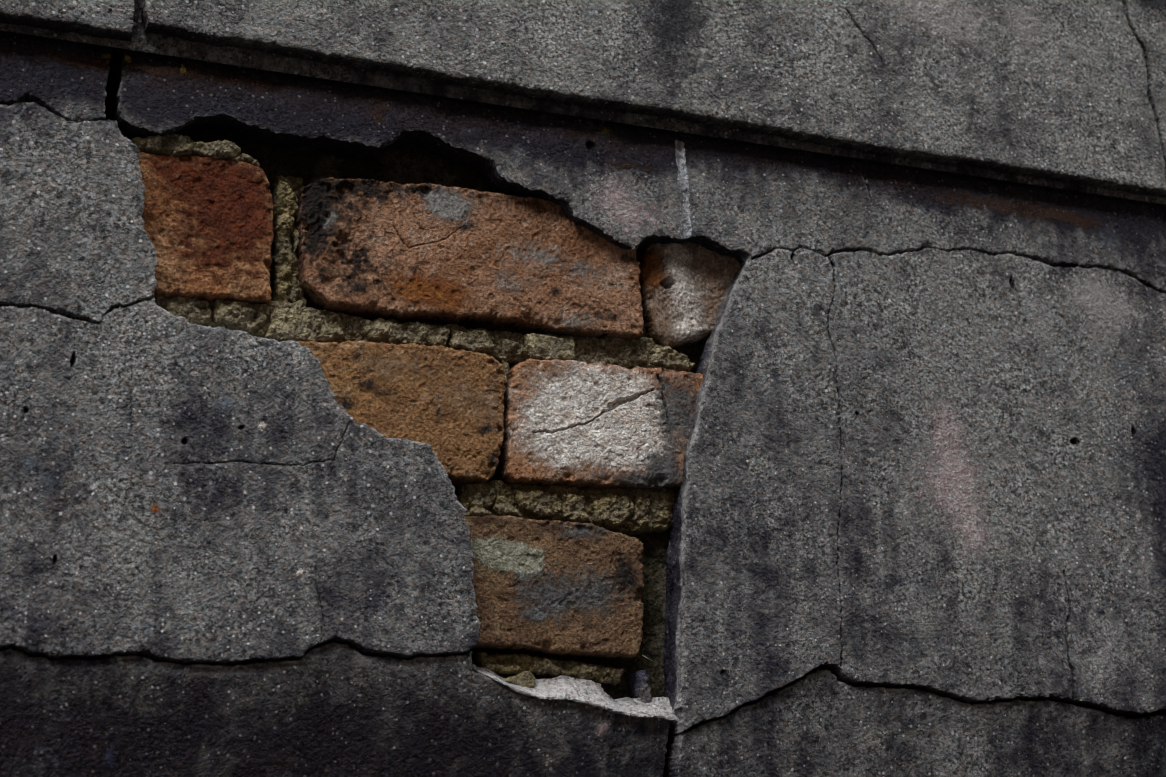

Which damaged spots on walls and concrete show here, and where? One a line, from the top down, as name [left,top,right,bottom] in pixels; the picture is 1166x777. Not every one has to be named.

crack [825,249,961,327]
flaking render [117,114,751,723]
crack [0,596,472,666]
crack [663,645,1166,777]